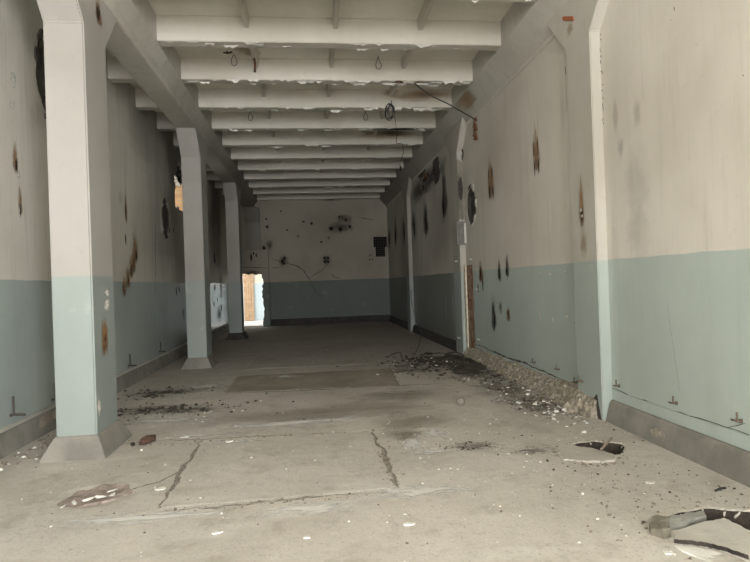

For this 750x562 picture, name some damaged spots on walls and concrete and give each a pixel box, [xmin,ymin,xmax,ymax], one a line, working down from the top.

flaking render [34,28,46,119]
flaking render [162,197,170,239]
flaking render [457,149,477,227]
rust [123,234,137,296]
crack [133,431,399,512]
spalling [573,442,624,455]